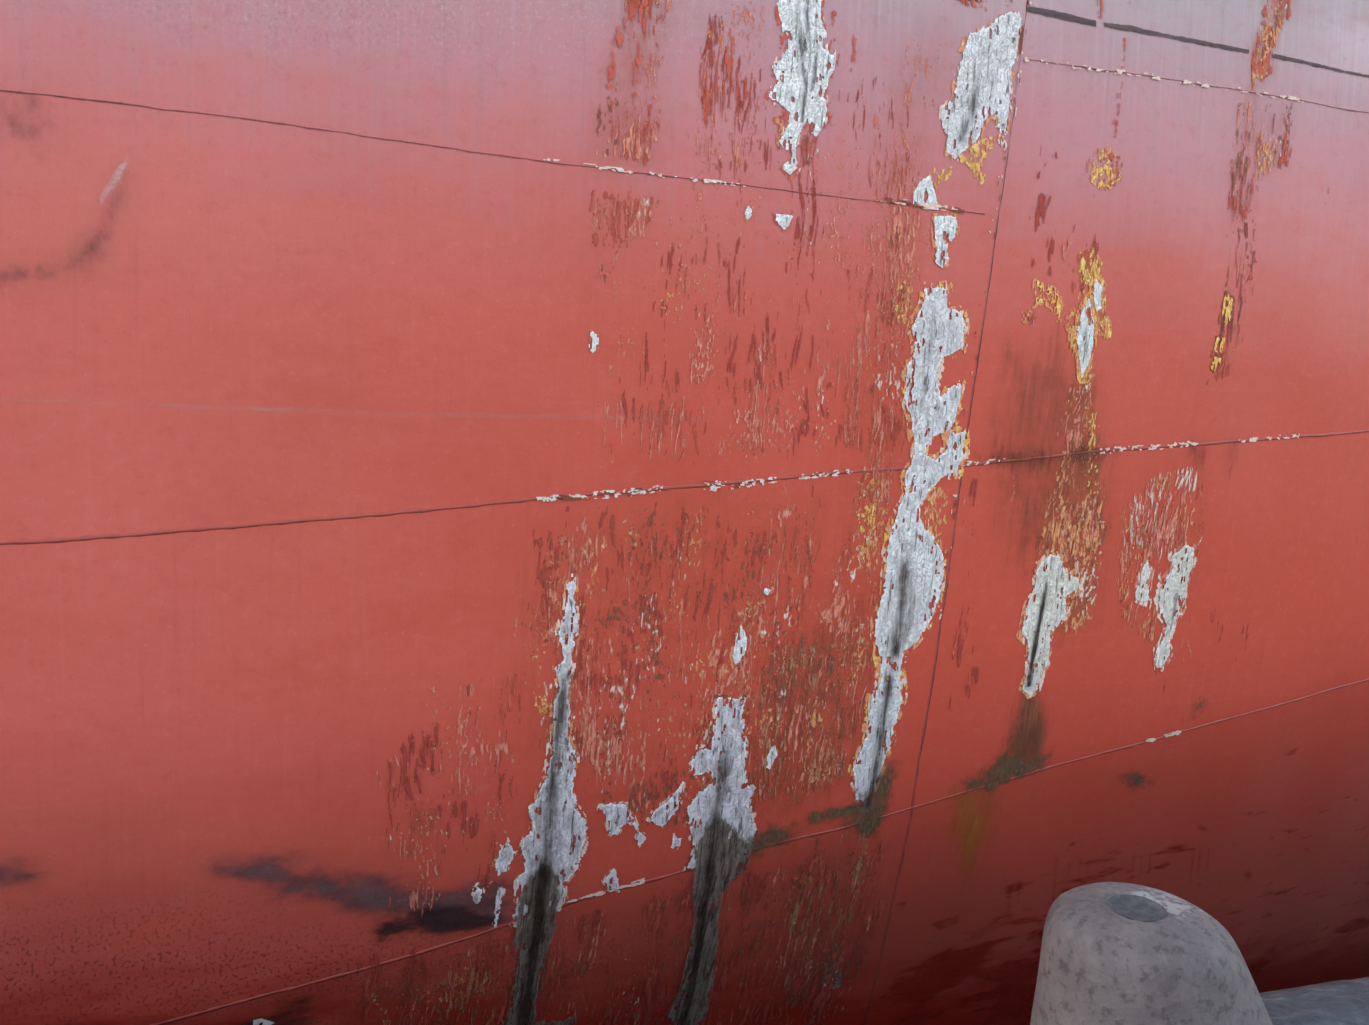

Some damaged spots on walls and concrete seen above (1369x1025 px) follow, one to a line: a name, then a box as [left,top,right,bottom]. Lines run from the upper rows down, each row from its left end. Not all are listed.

peeling [765,0,840,180]
peeling [1180,80,1304,102]
corrosion [1206,0,1292,385]
corrosion [376,0,938,918]
peeling [848,0,1160,807]
peeling [1100,441,1198,454]
peeling [1134,542,1197,672]
peeling [471,574,778,1025]
corrosion [1010,691,1042,758]